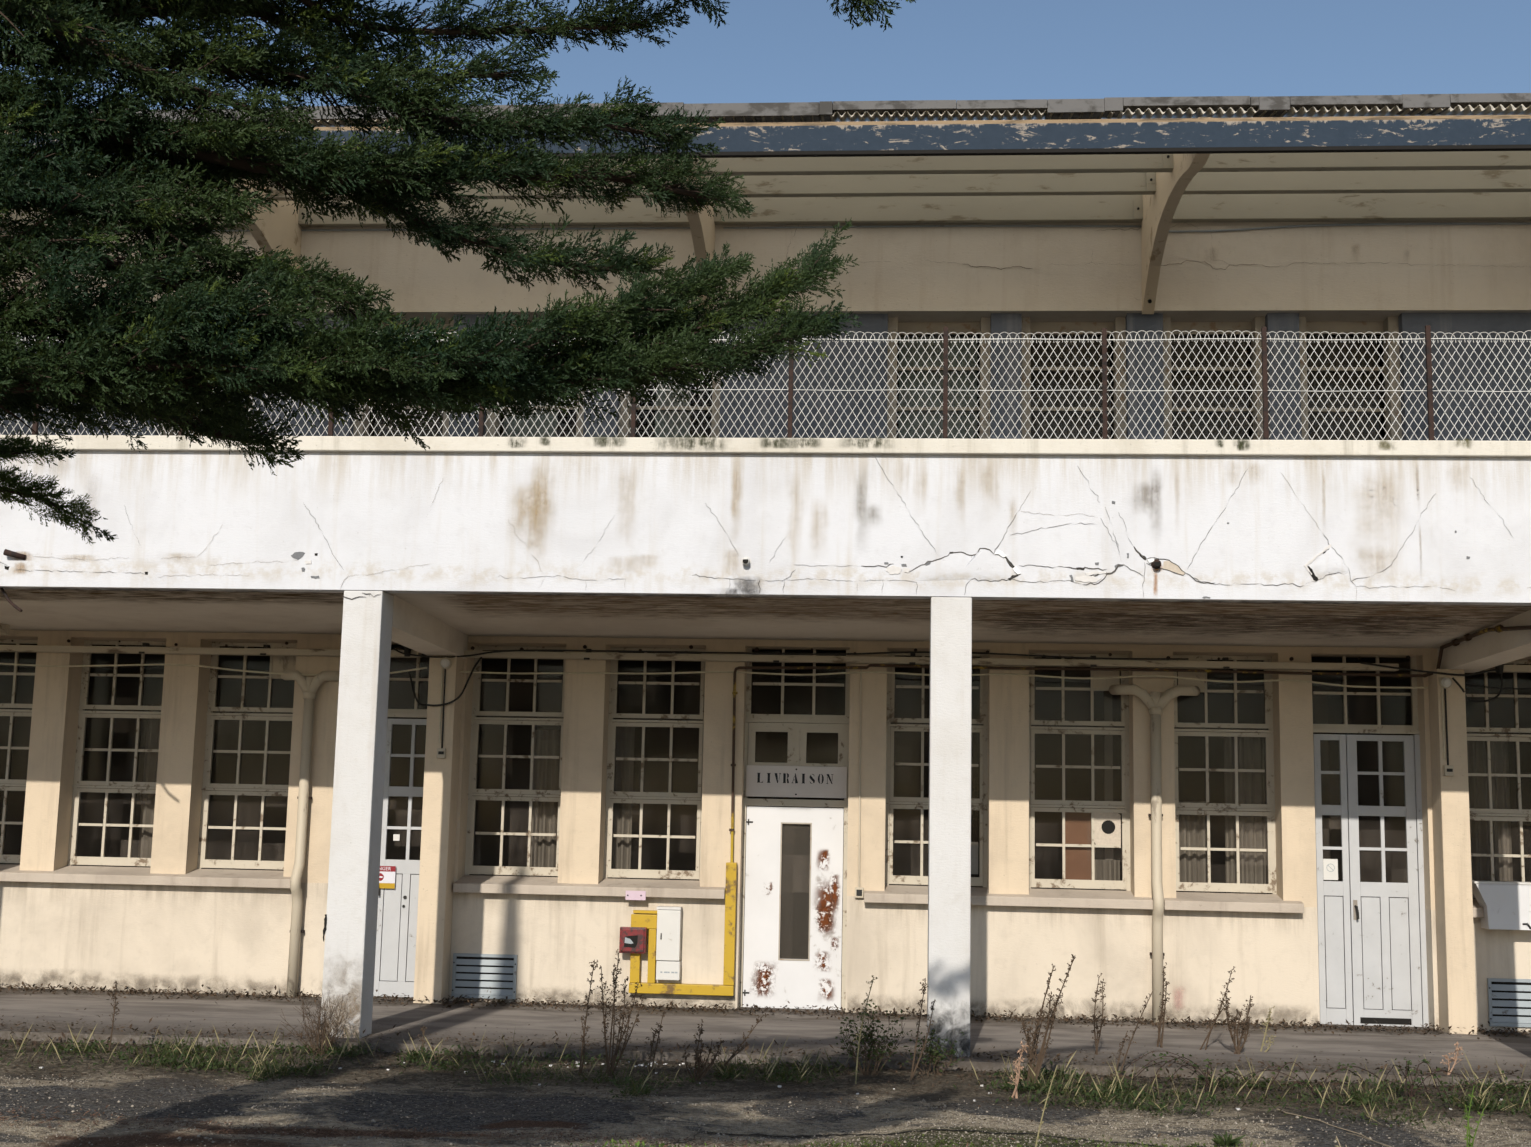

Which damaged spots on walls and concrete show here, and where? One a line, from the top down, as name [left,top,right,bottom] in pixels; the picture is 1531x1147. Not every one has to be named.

crack [692,464,1449,597]
corrosion [817,850,839,999]